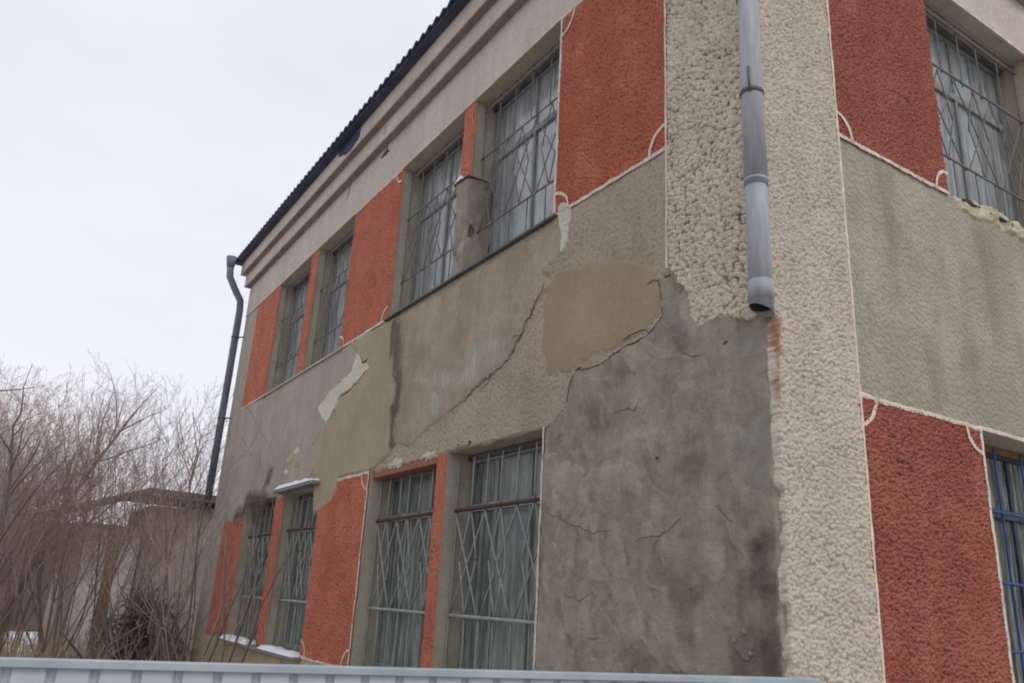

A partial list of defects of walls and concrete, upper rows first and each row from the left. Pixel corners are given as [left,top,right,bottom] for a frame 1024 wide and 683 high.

spalling [959,198,1014,227]
peeling [318,352,369,423]
leakage [390,321,400,447]
crack [450,261,550,411]
crack [546,279,705,430]